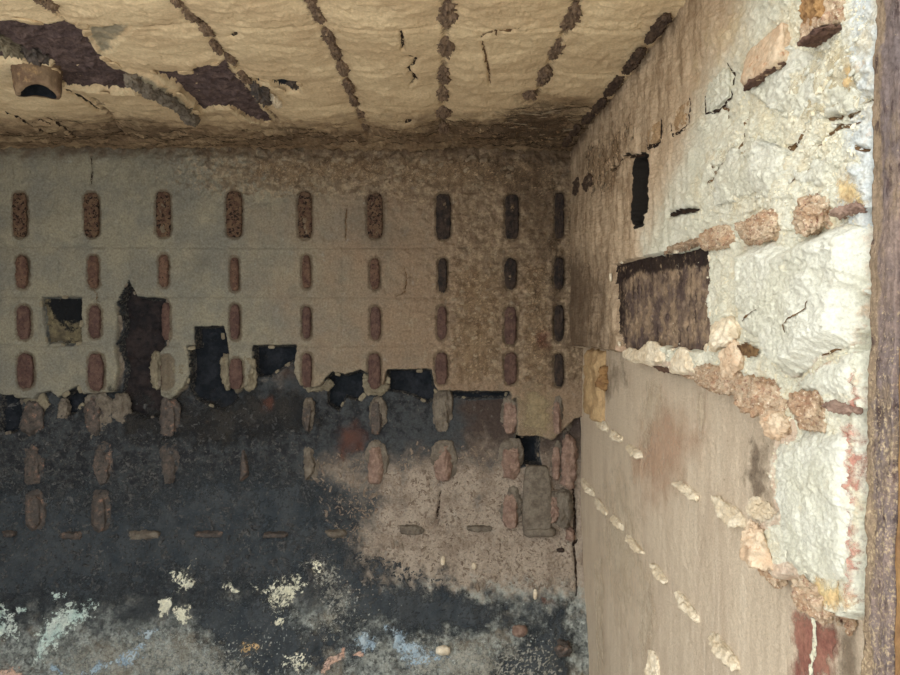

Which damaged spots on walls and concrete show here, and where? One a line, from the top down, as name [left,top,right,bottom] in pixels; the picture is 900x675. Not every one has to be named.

spalling [0,17,126,95]
spalling [148,60,303,123]
crack [400,29,417,85]
crack [481,28,519,83]
crack [611,63,748,171]
spalling [39,295,84,346]
spalling [118,283,165,418]
spalling [187,328,239,408]
spalling [609,248,759,380]
damp [170,558,197,591]
damp [0,592,259,675]
damp [252,555,561,675]